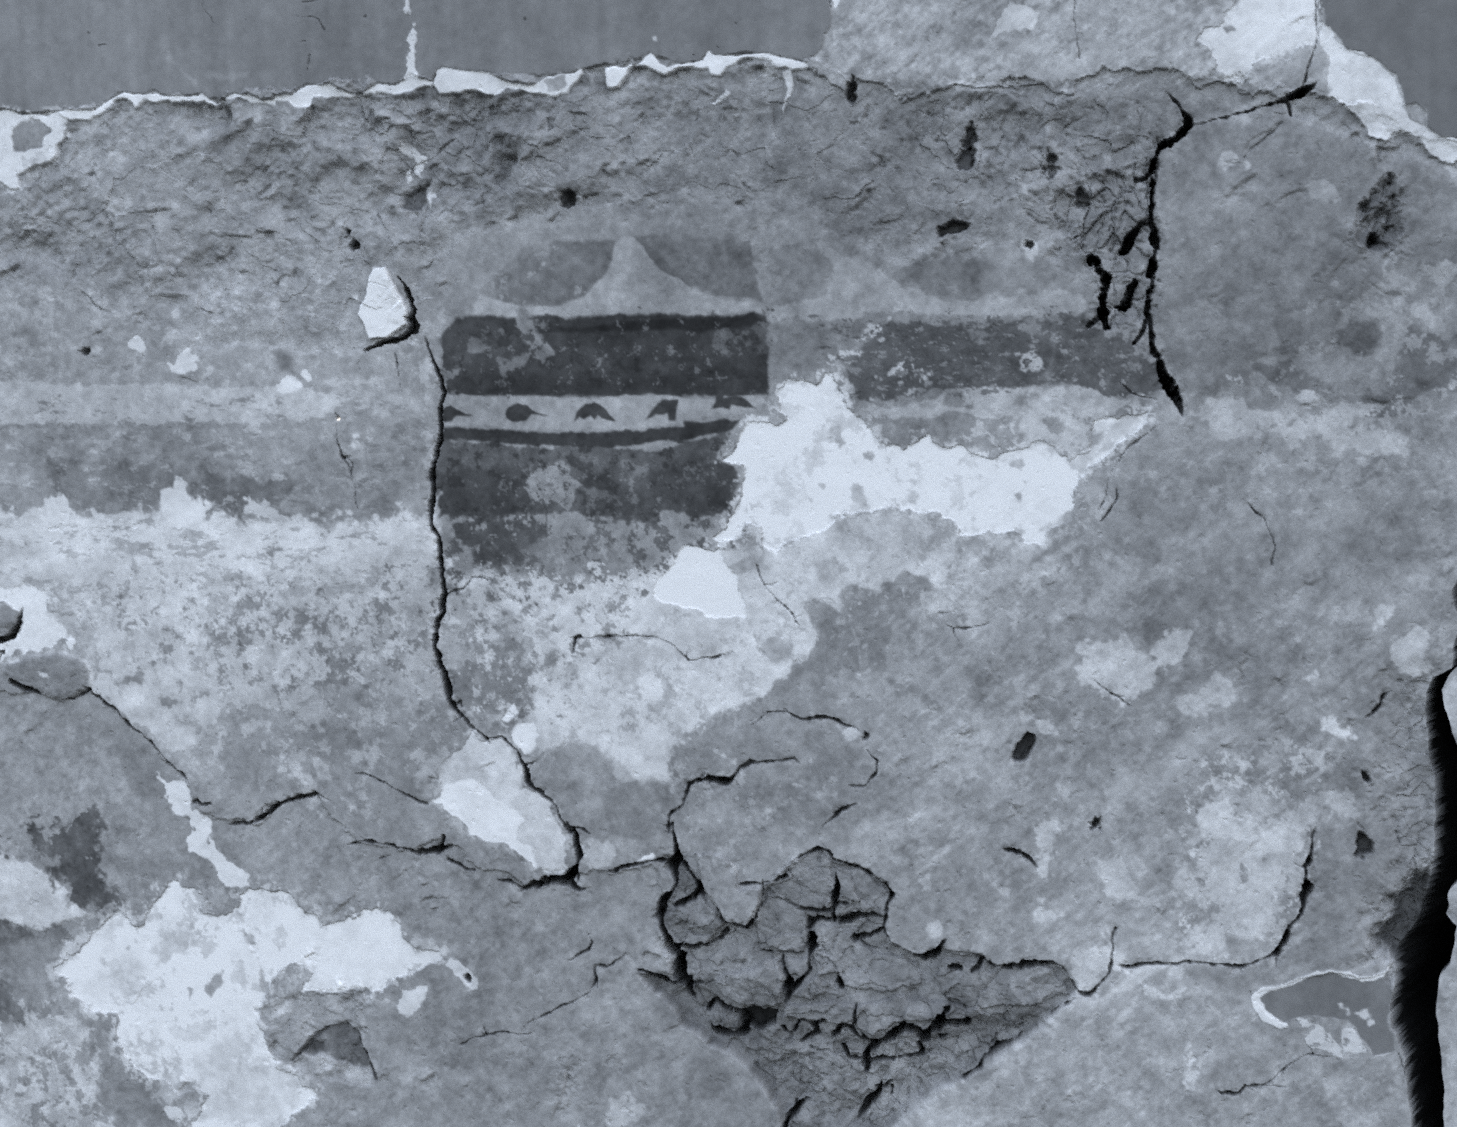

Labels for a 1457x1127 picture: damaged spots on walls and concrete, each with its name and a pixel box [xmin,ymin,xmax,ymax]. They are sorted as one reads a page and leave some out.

flaking render [0,0,1457,395]
flaking render [54,879,479,1127]
flaking render [0,302,1150,874]
crack [0,276,1334,1122]
flaking render [637,850,1076,1127]
crack [1365,581,1457,1127]